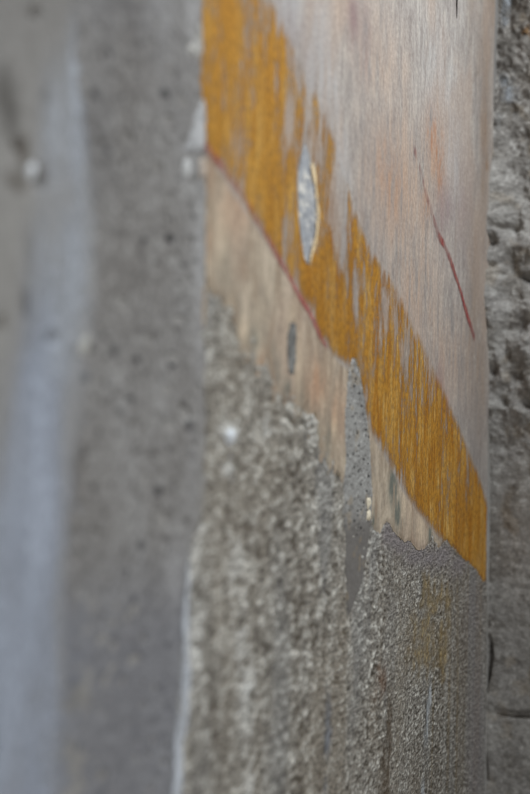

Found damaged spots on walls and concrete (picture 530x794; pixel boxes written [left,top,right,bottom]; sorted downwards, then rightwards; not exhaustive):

flaking render [297,143,320,265]